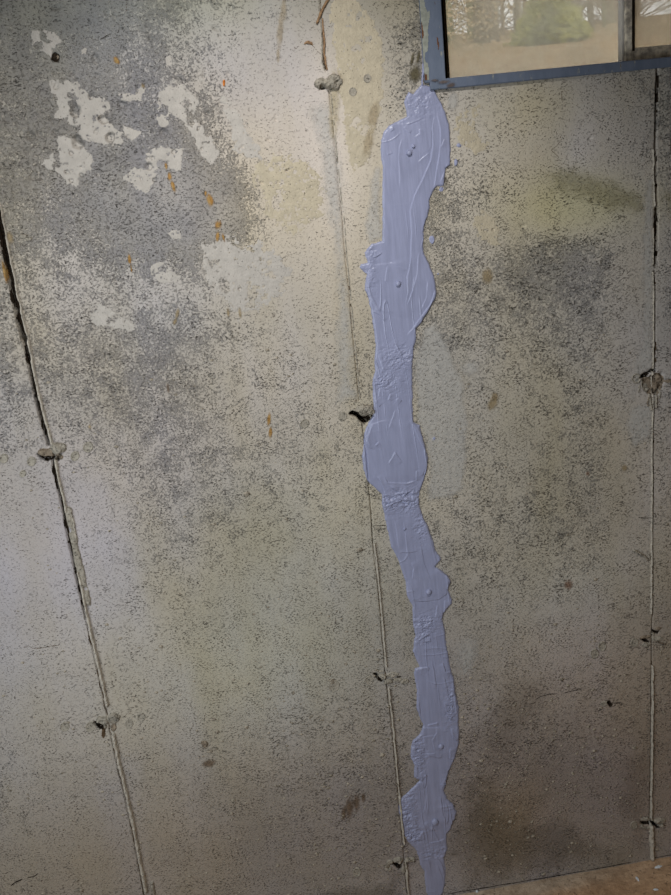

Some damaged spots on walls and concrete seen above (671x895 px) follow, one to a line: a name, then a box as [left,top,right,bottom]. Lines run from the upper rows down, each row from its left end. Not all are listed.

peeling [31,30,62,62]
peeling [41,79,146,187]
peeling [123,146,184,193]
peeling [156,84,220,165]
peeling [251,152,327,236]